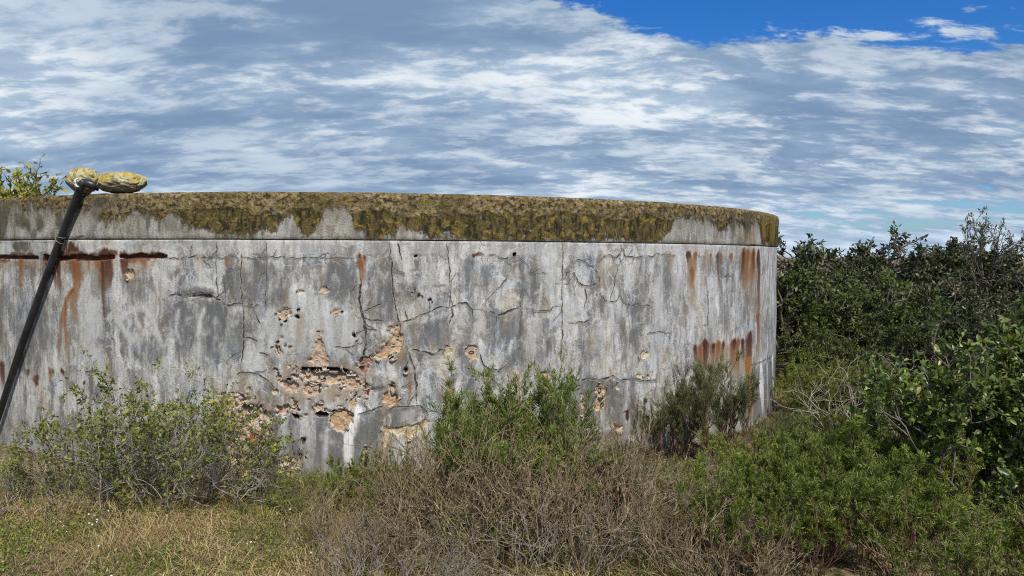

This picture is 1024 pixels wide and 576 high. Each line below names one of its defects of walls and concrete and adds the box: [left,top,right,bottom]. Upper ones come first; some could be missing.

rust [0,242,168,350]
water stain [116,264,356,369]
rust [350,251,366,277]
crack [169,242,675,415]
water stain [596,287,637,337]
water stain [652,249,682,344]
rust [687,247,761,409]
spalling [215,306,430,475]
water stain [268,405,378,476]
water stain [571,378,643,454]
water stain [754,355,776,419]